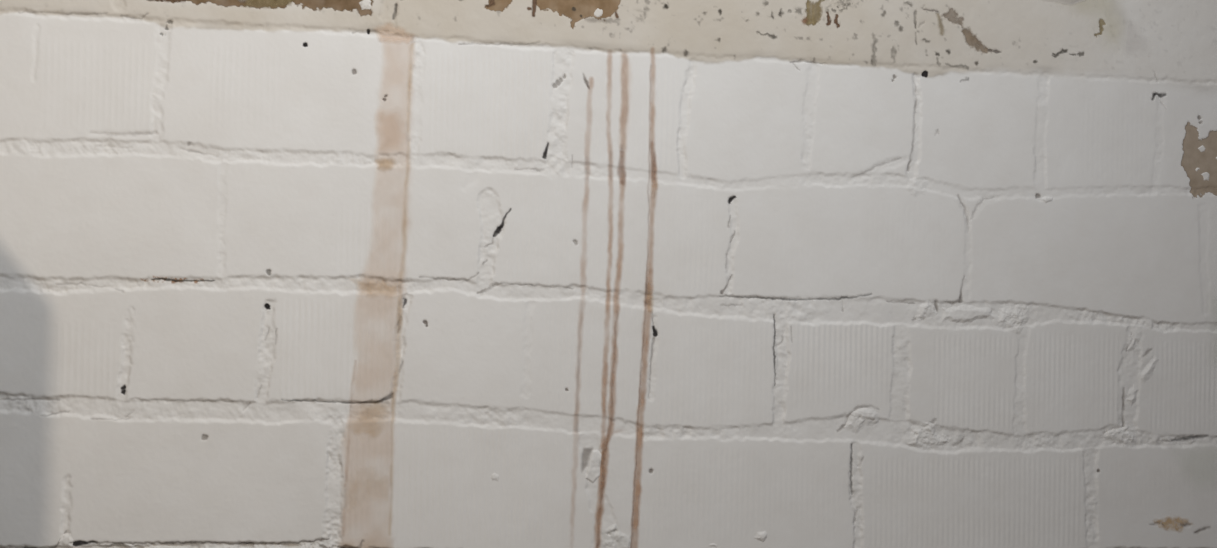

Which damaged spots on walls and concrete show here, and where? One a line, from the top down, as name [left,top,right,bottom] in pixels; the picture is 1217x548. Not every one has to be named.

peeling [149,0,373,16]
peeling [485,0,512,12]
peeling [527,0,620,29]
peeling [803,0,840,28]
spalling [924,8,999,53]
peeling [1181,116,1217,198]
crack [493,209,511,237]
corrosion [600,438,608,490]